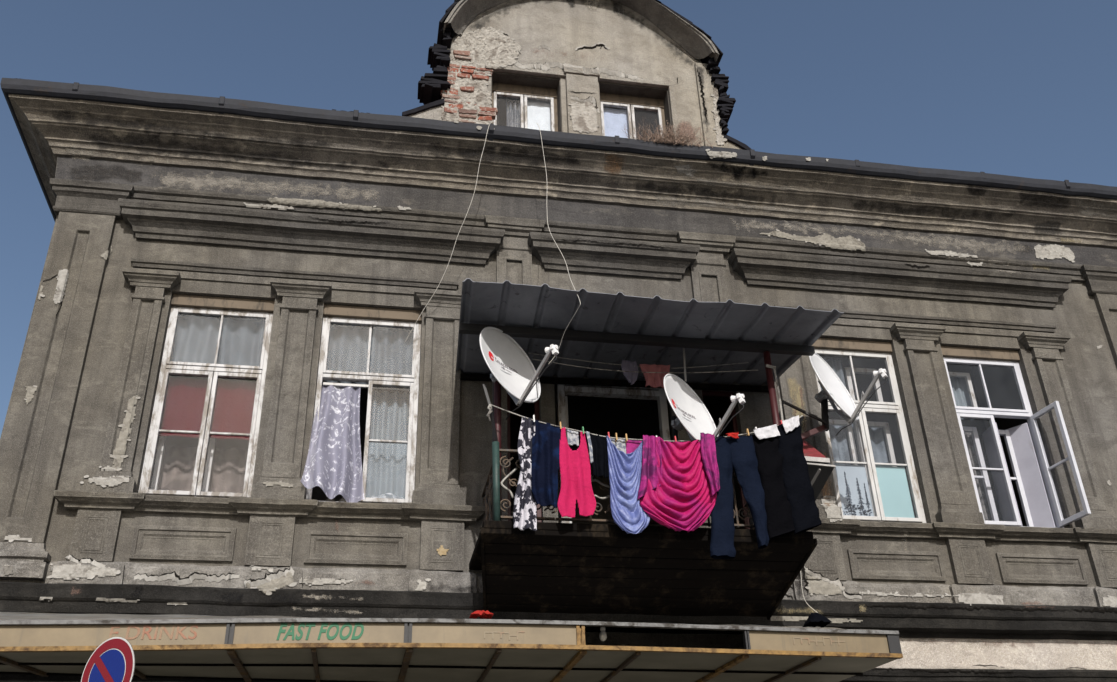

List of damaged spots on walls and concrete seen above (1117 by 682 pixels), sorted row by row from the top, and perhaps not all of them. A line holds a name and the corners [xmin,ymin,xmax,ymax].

flaking render [441,27,522,130]
crack [473,31,644,115]
water stain [57,112,376,199]
water stain [433,142,578,165]
flaking render [760,229,866,251]
water stain [636,162,1030,273]
water stain [859,193,1068,220]
flaking render [1034,244,1075,263]
flaking render [80,395,141,487]
peeling [47,563,121,580]
crack [134,566,346,589]
crack [786,565,1117,613]